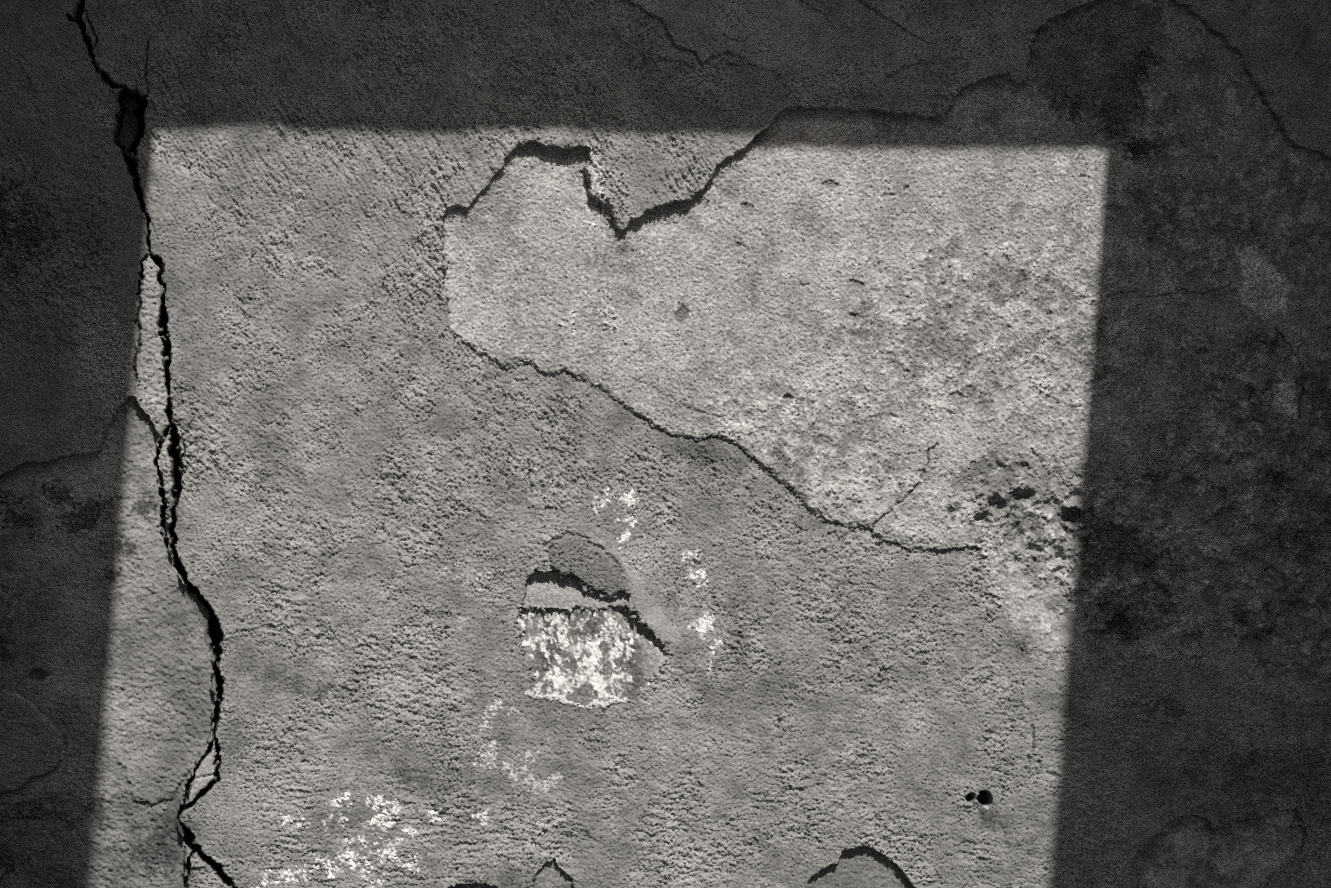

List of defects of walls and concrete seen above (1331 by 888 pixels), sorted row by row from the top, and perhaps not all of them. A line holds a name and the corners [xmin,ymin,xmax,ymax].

crack [67,11,99,47]
crack [103,42,149,165]
flaking render [440,0,1331,710]
crack [133,251,237,888]
flaking render [807,845,917,888]